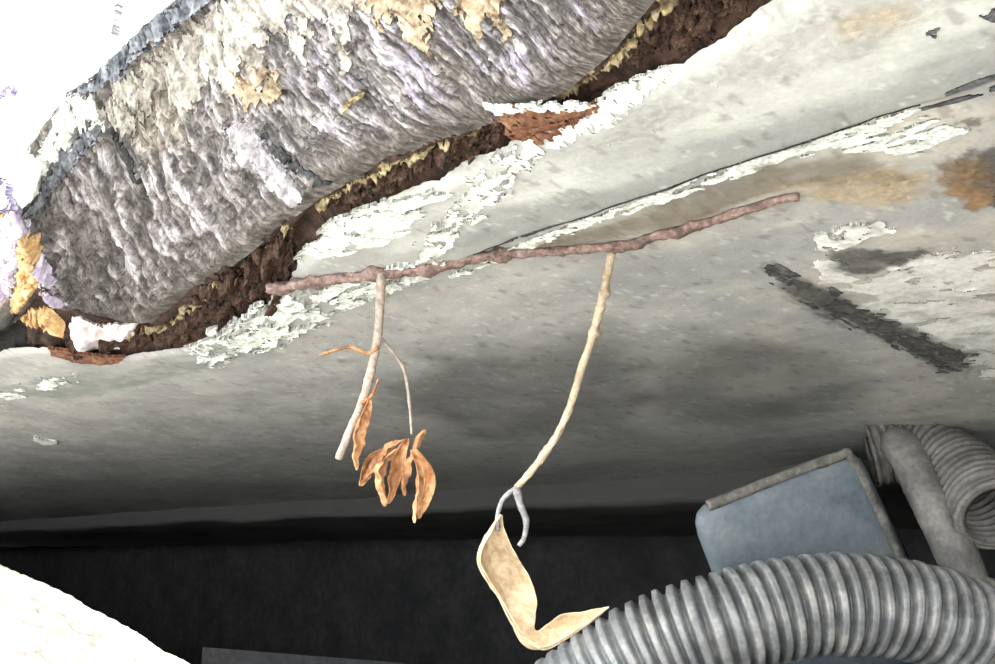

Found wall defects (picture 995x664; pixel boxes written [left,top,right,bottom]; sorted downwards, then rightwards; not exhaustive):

spalling [126,281,219,341]
peeling [0,0,514,220]
peeling [183,126,545,369]
corrosion [18,0,772,366]
peeling [506,107,968,250]
leakage [775,271,974,371]
peeling [764,219,995,380]
leakage [833,249,929,274]
corrosion [937,159,995,212]